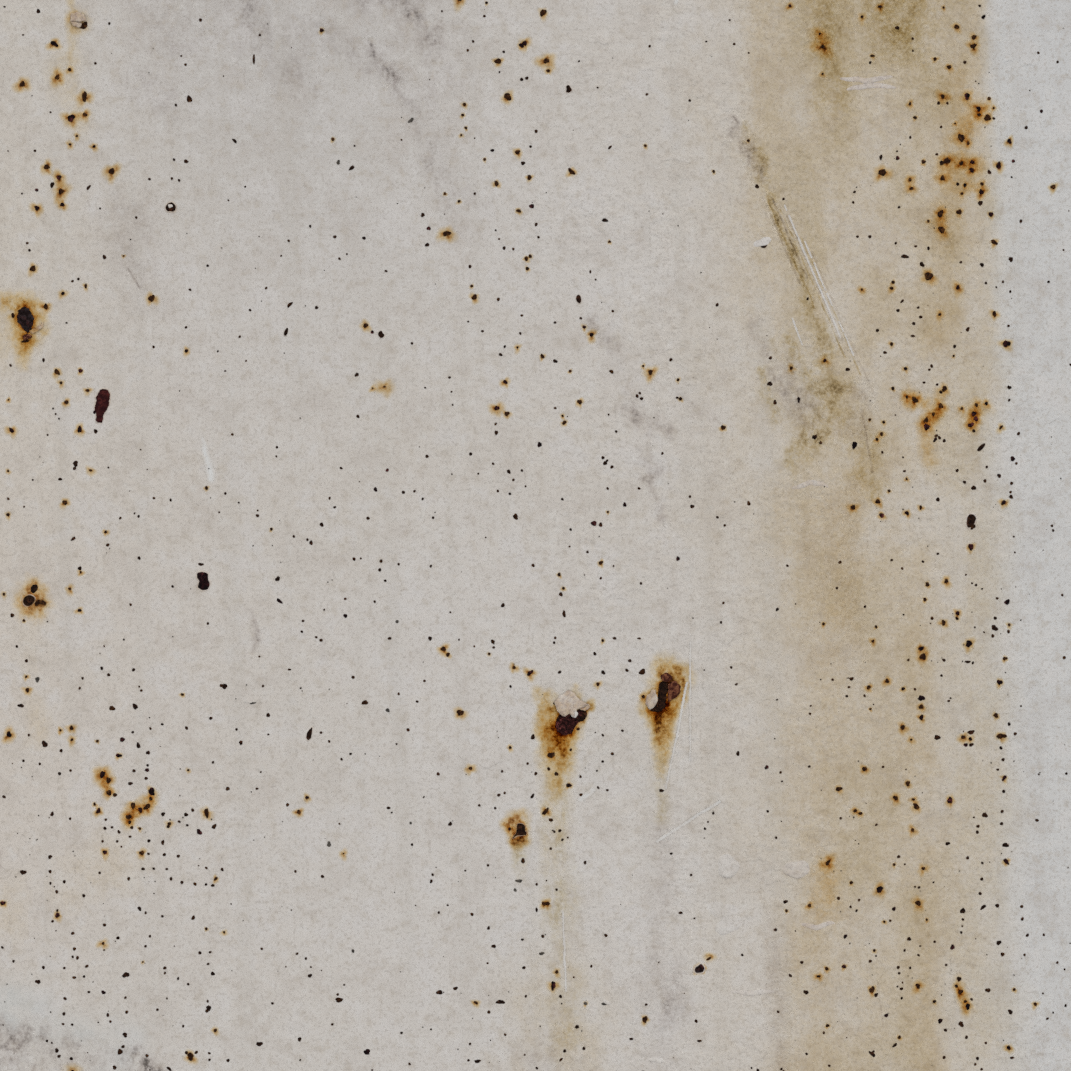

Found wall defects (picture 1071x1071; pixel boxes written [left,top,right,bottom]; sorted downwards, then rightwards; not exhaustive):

corrosion [852,5,1043,281]
corrosion [497,730,624,850]